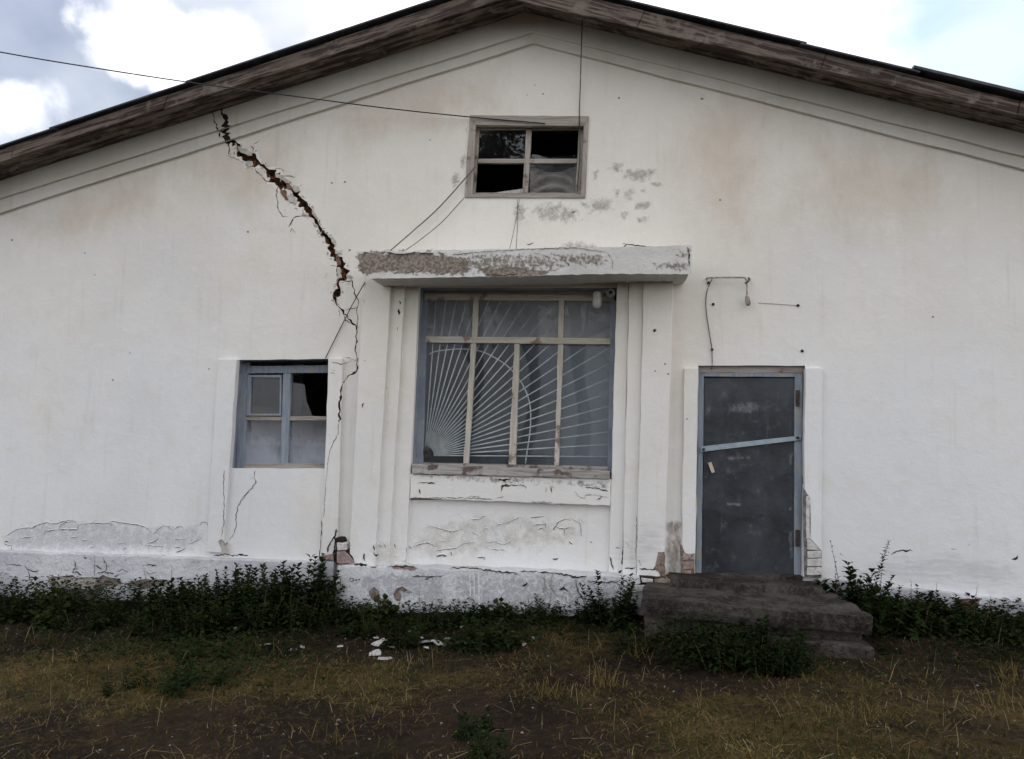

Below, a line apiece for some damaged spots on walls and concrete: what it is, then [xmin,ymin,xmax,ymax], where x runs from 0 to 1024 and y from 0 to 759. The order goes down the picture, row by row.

spalling [349,246,607,278]
crack [212,109,366,516]
peeling [4,519,200,559]
crack [214,471,257,557]
spalling [630,544,695,592]
flaking render [802,488,822,578]